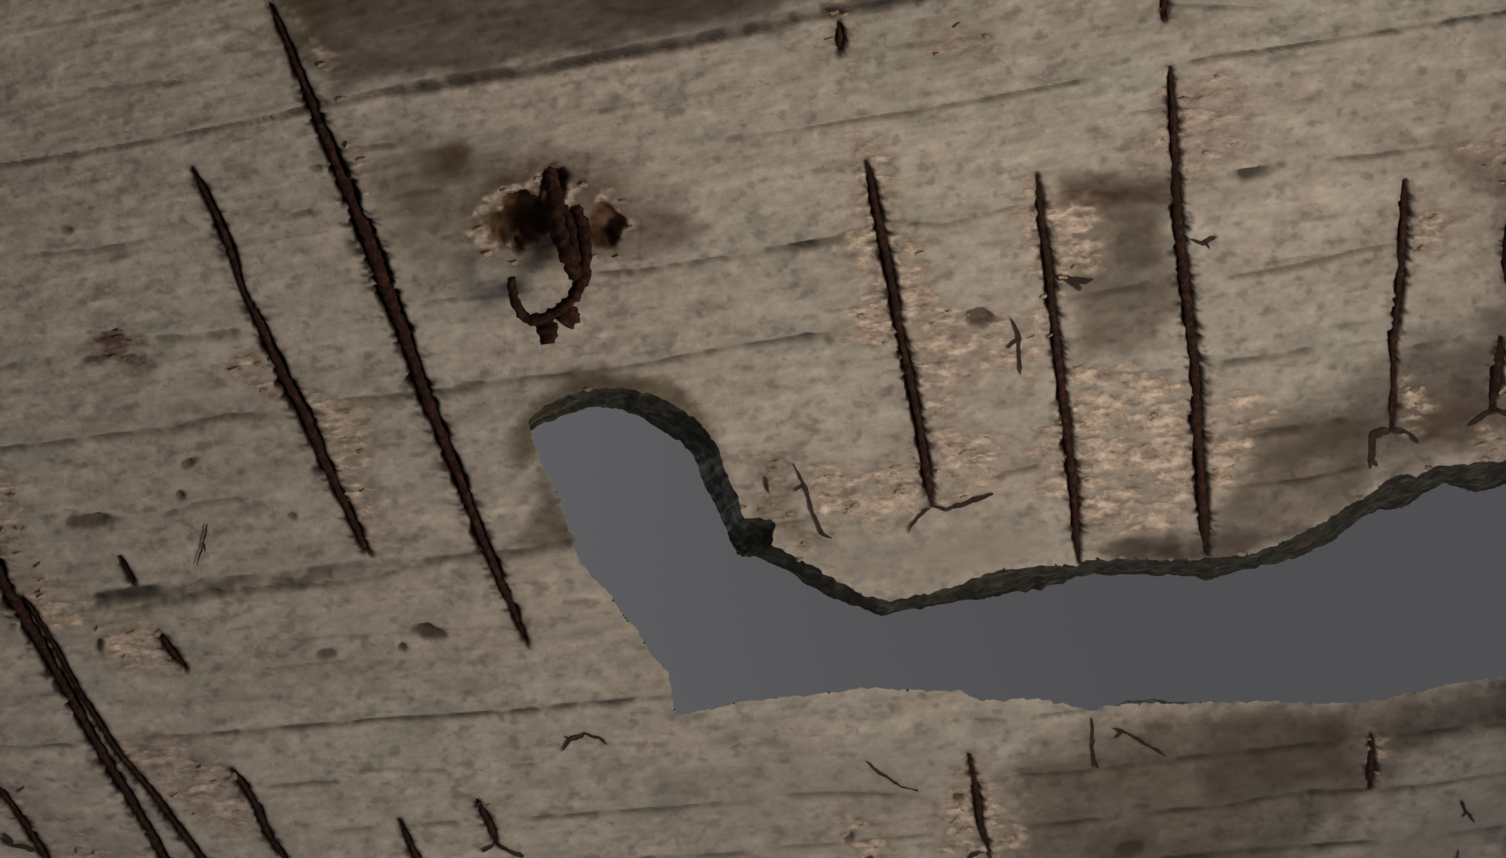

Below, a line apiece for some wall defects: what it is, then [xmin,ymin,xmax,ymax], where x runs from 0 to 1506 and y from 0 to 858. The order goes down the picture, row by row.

crack [1191,237,1217,249]
crack [1053,274,1093,291]
spalling [528,65,1506,616]
crack [1468,407,1506,427]
crack [197,524,208,564]
spalling [1095,699,1226,711]
crack [0,832,38,852]
crack [968,850,992,858]